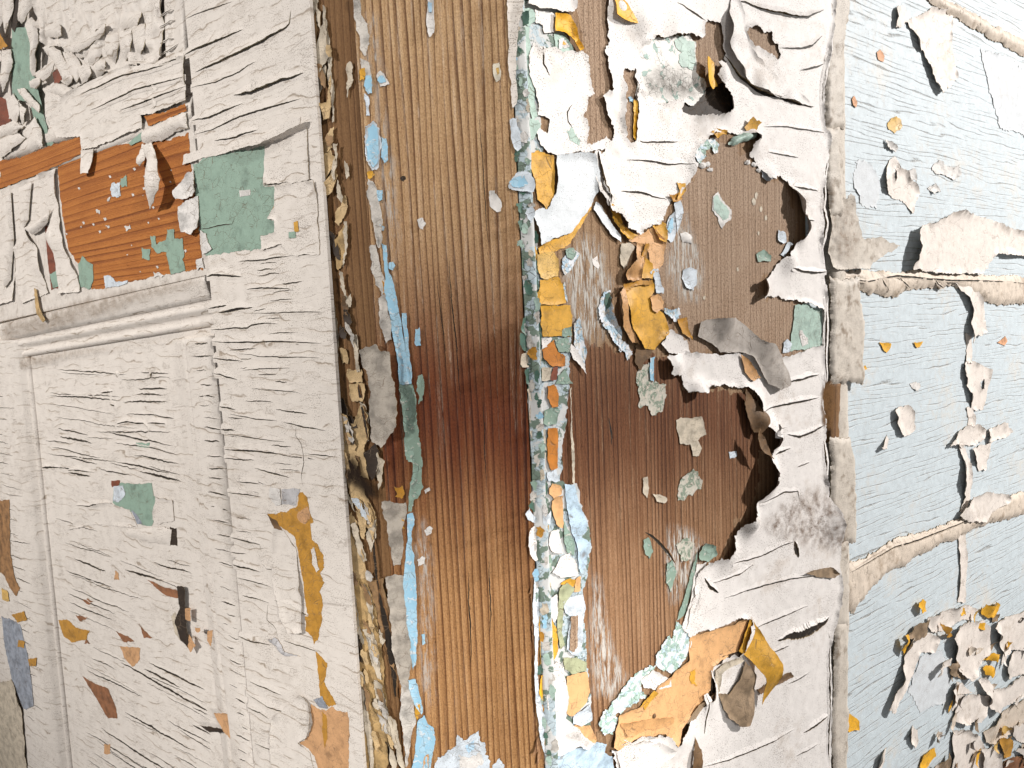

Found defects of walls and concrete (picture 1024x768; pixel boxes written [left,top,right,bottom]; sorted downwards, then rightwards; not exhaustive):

crack [80,0,304,144]
peeling [426,0,435,37]
peeling [896,5,959,93]
peeling [828,116,962,270]
crack [42,368,192,620]
peeling [0,0,405,768]
crack [193,250,334,762]
peeling [493,0,823,768]
peeling [895,405,916,437]
peeling [913,209,1024,523]
crack [83,646,213,768]
peeling [889,534,1024,768]